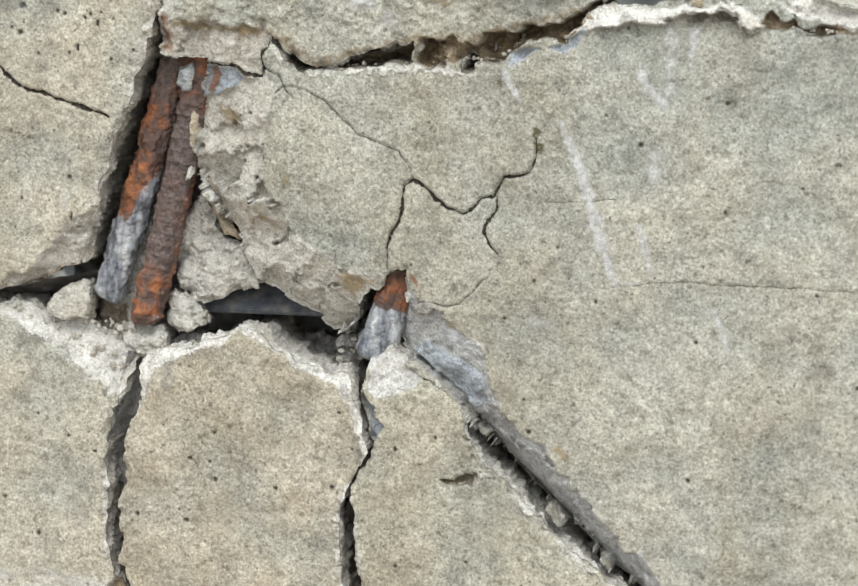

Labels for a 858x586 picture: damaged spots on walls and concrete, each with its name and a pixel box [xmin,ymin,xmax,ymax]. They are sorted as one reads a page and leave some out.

crack [343,15,595,66]
crack [0,66,109,117]
spalling [160,19,380,326]
crack [209,40,537,257]
spalling [3,210,93,283]
crack [0,260,101,298]
crack [433,275,489,307]
crack [108,350,144,549]
crack [344,480,361,580]
crack [489,424,594,541]